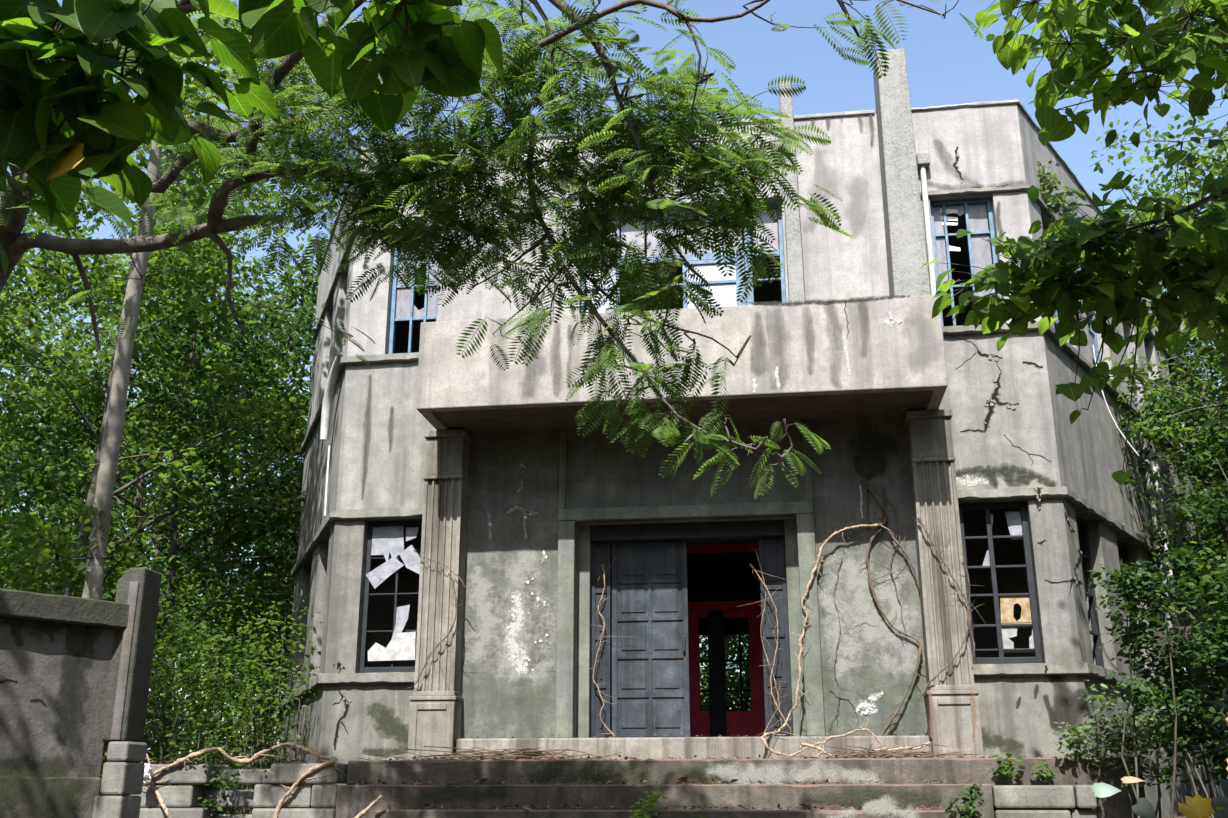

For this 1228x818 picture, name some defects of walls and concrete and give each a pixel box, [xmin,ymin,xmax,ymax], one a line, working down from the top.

crack [953,147,1008,188]
damp [531,327,571,384]
damp [744,295,909,393]
damp [362,375,371,499]
damp [955,465,1055,488]
crack [952,336,1083,586]
peeling [503,572,557,676]
crack [0,678,47,707]
damp [0,616,101,749]
crack [333,689,351,750]